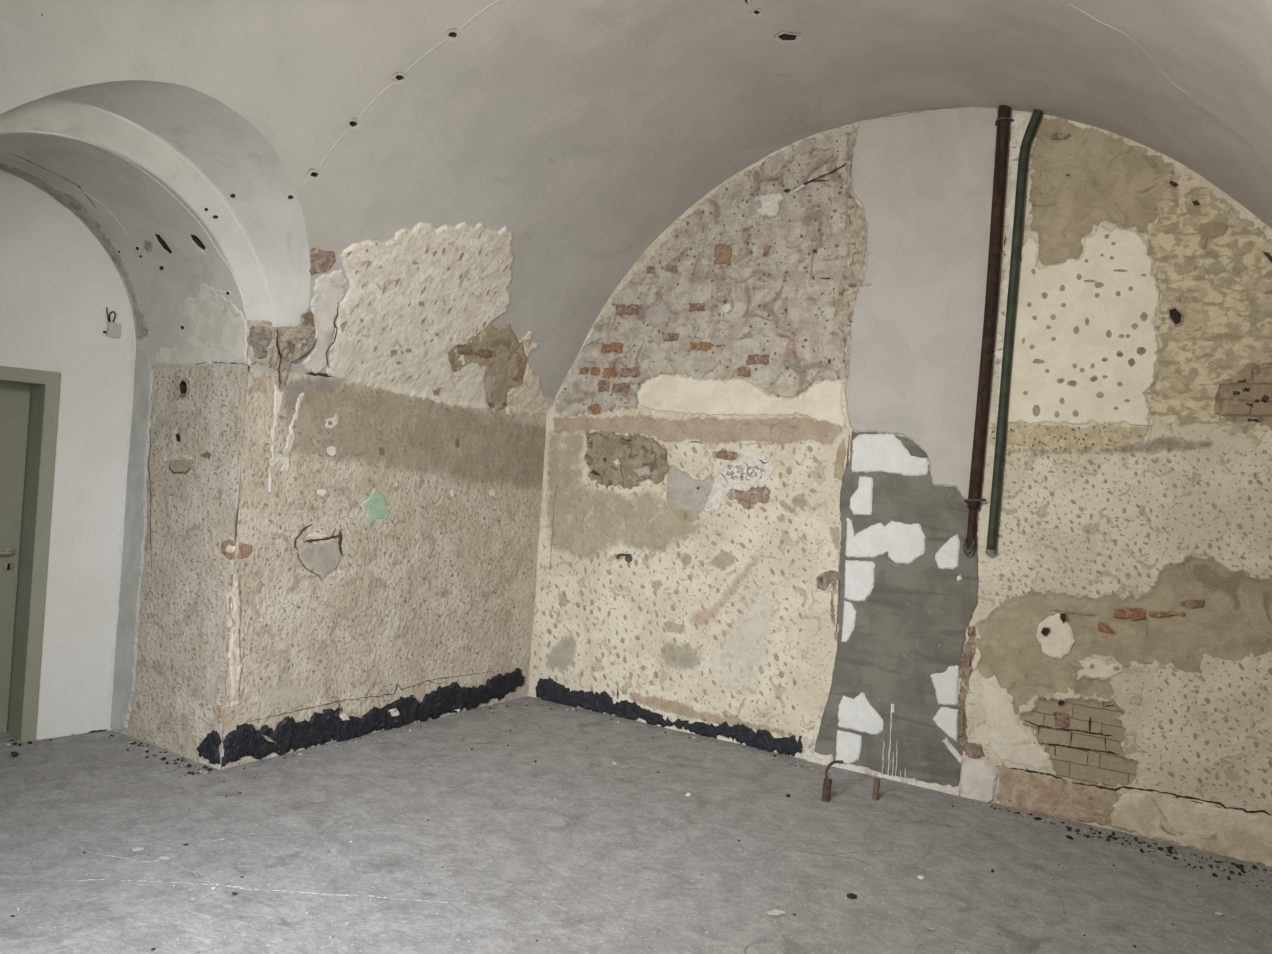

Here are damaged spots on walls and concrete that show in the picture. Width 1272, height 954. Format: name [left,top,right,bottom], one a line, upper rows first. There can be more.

spalling [246,124,872,417]
peeling [990,111,1272,454]
peeling [268,391,305,473]
peeling [324,412,339,429]
spalling [584,430,669,491]
peeling [697,448,805,521]
peeling [711,551,735,569]
peeling [665,622,684,632]
peeling [804,431,1272,827]
crack [997,766,1271,815]